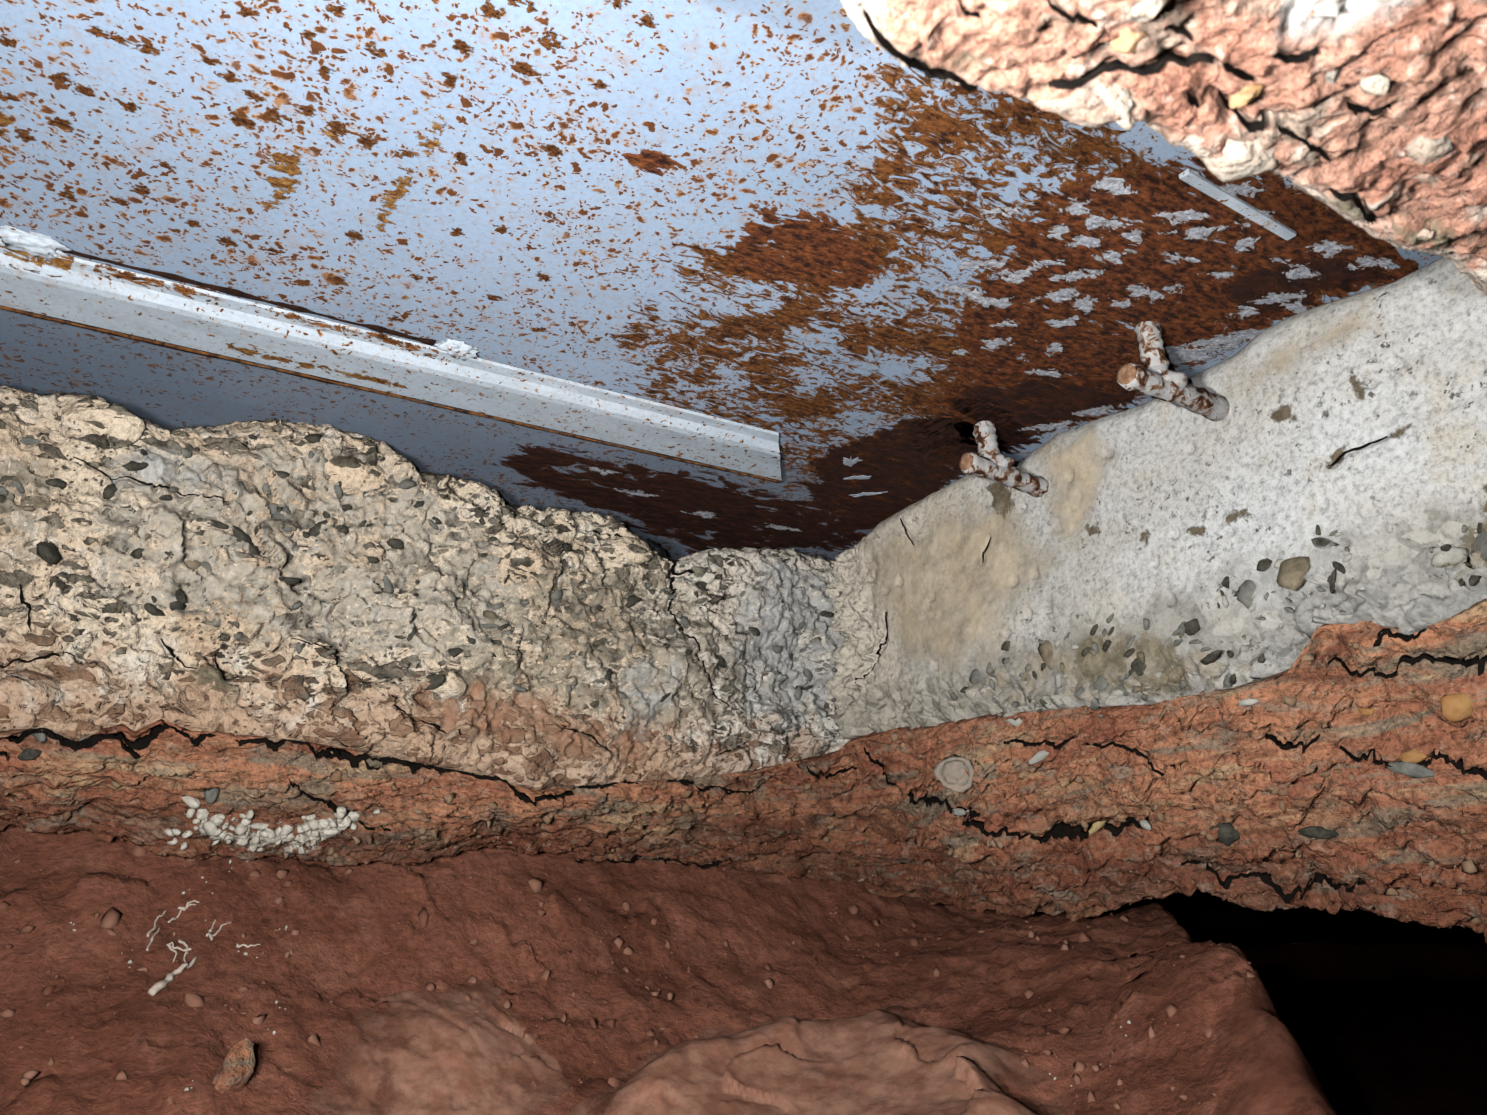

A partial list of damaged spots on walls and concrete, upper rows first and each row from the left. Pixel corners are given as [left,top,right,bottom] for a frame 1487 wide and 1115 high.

rust [84,26,160,56]
rust [479,0,537,19]
rust [604,0,658,28]
rust [0,56,1422,555]
peeling [843,457,888,497]
spalling [1217,525,1354,629]
spalling [1429,485,1487,586]
spalling [950,614,1266,718]
crack [1327,628,1487,679]
crack [0,695,754,832]
crack [807,747,1150,844]
crack [1265,733,1487,781]